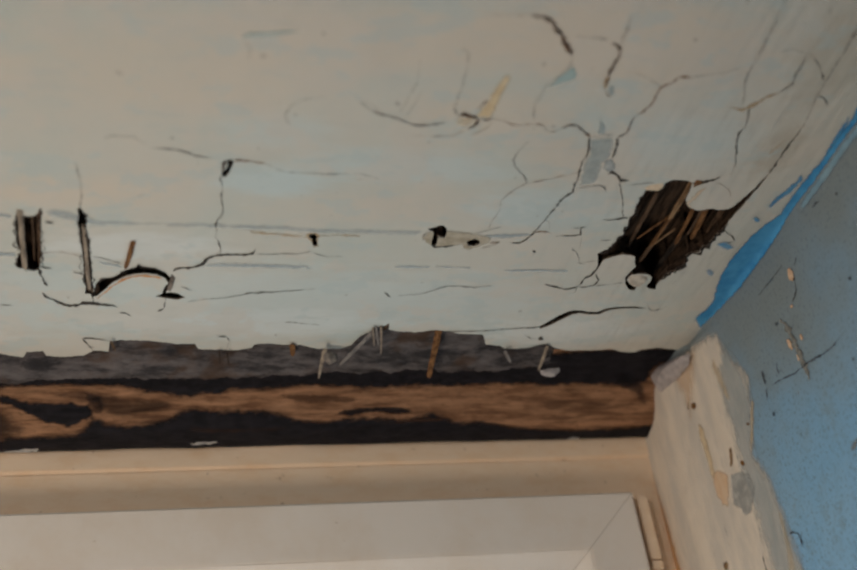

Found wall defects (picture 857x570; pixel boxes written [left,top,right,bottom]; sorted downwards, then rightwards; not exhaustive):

crack [362,0,857,332]
hole [12,208,54,286]
flaking render [76,193,104,304]
crack [42,175,308,316]
peeling [423,225,490,249]
hole [597,174,769,290]
flaking render [0,323,560,385]
leakage [0,349,675,452]
peeling [699,426,754,514]